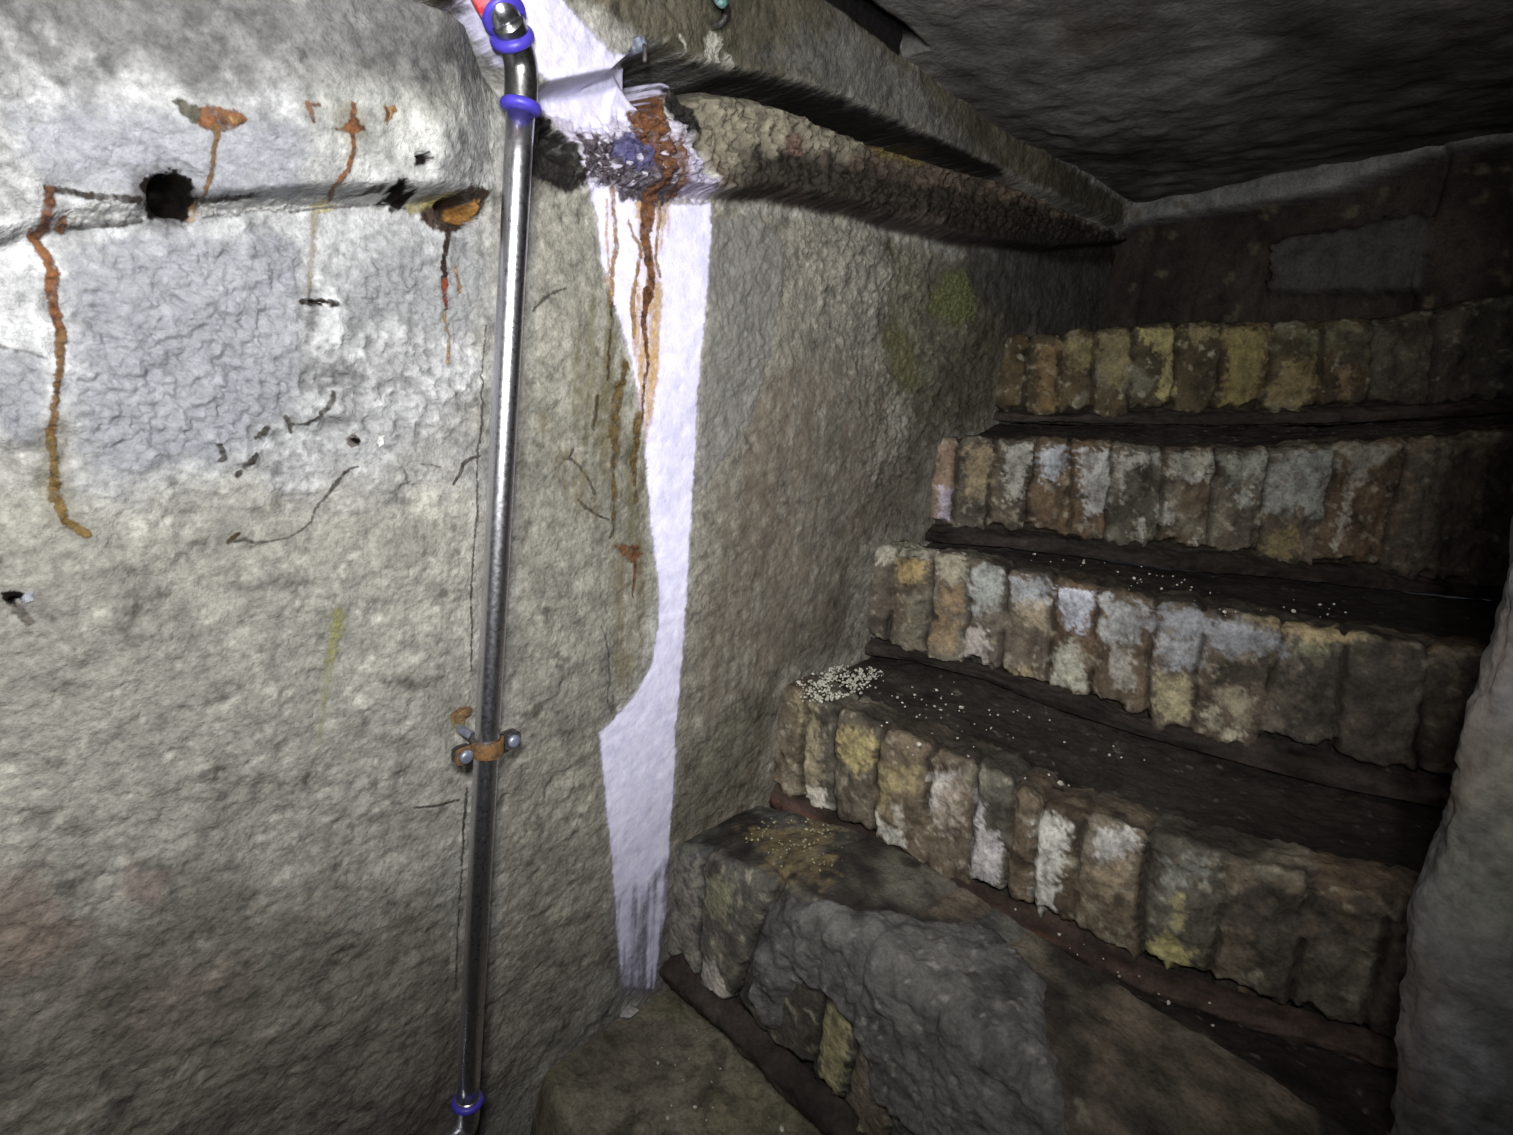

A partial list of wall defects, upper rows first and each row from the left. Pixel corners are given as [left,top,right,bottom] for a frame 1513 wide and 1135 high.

rust [172,98,248,197]
rust [327,102,365,203]
rust [384,105,397,124]
crack [0,185,142,244]
crack [192,192,406,213]
rust [574,95,718,432]
rust [26,186,92,537]
rust [616,545,642,598]